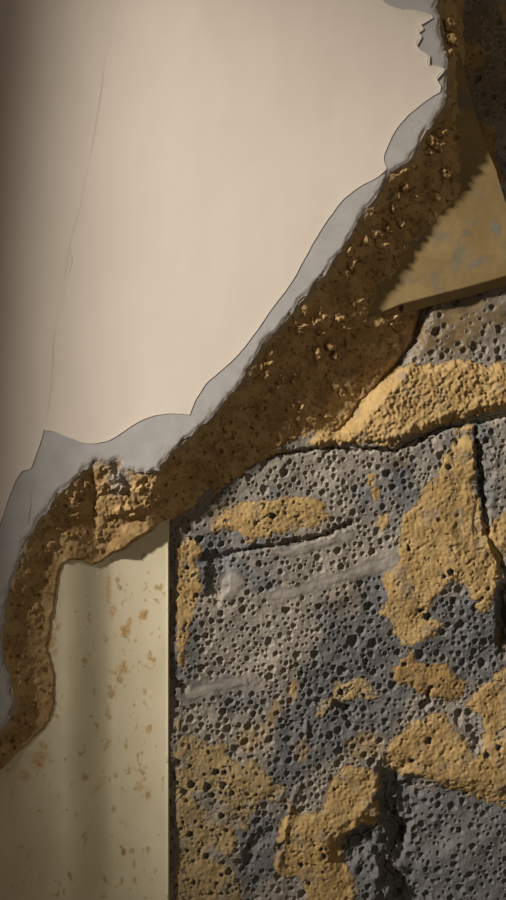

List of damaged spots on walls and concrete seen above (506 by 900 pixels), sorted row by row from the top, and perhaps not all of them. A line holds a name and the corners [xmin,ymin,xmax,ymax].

spalling [0,0,466,770]
crack [274,414,503,536]
crack [233,524,348,552]